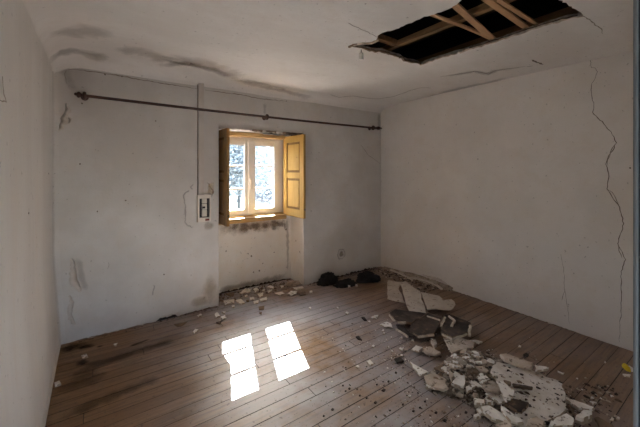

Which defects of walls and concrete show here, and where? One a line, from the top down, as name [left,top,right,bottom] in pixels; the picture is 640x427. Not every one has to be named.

spalling [219,278,304,305]
crack [590,60,626,337]